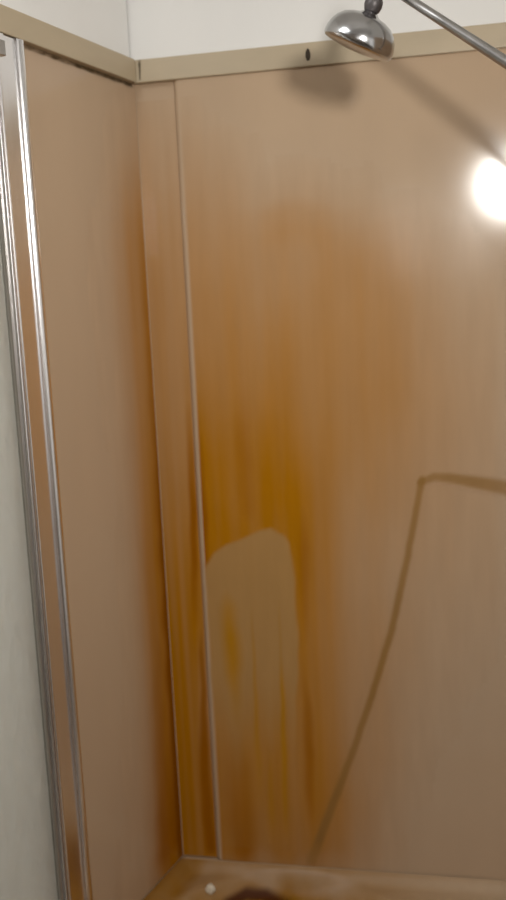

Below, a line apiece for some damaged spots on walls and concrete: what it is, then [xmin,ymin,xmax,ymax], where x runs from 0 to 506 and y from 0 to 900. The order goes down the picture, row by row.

peeling [204,524,302,854]
rust [86,86,506,900]